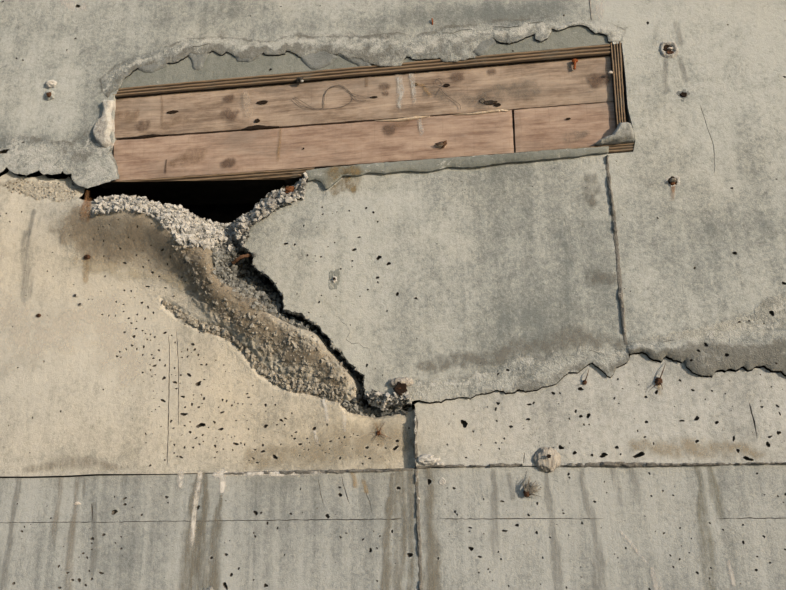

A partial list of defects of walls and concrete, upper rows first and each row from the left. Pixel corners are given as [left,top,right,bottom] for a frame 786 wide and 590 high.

peeling [93,17,626,148]
spalling [0,176,85,203]
leakage [60,209,336,386]
spalling [162,300,346,404]
crack [211,206,412,418]
spalling [367,389,415,412]
leakage [182,415,413,590]
leakage [426,468,439,590]